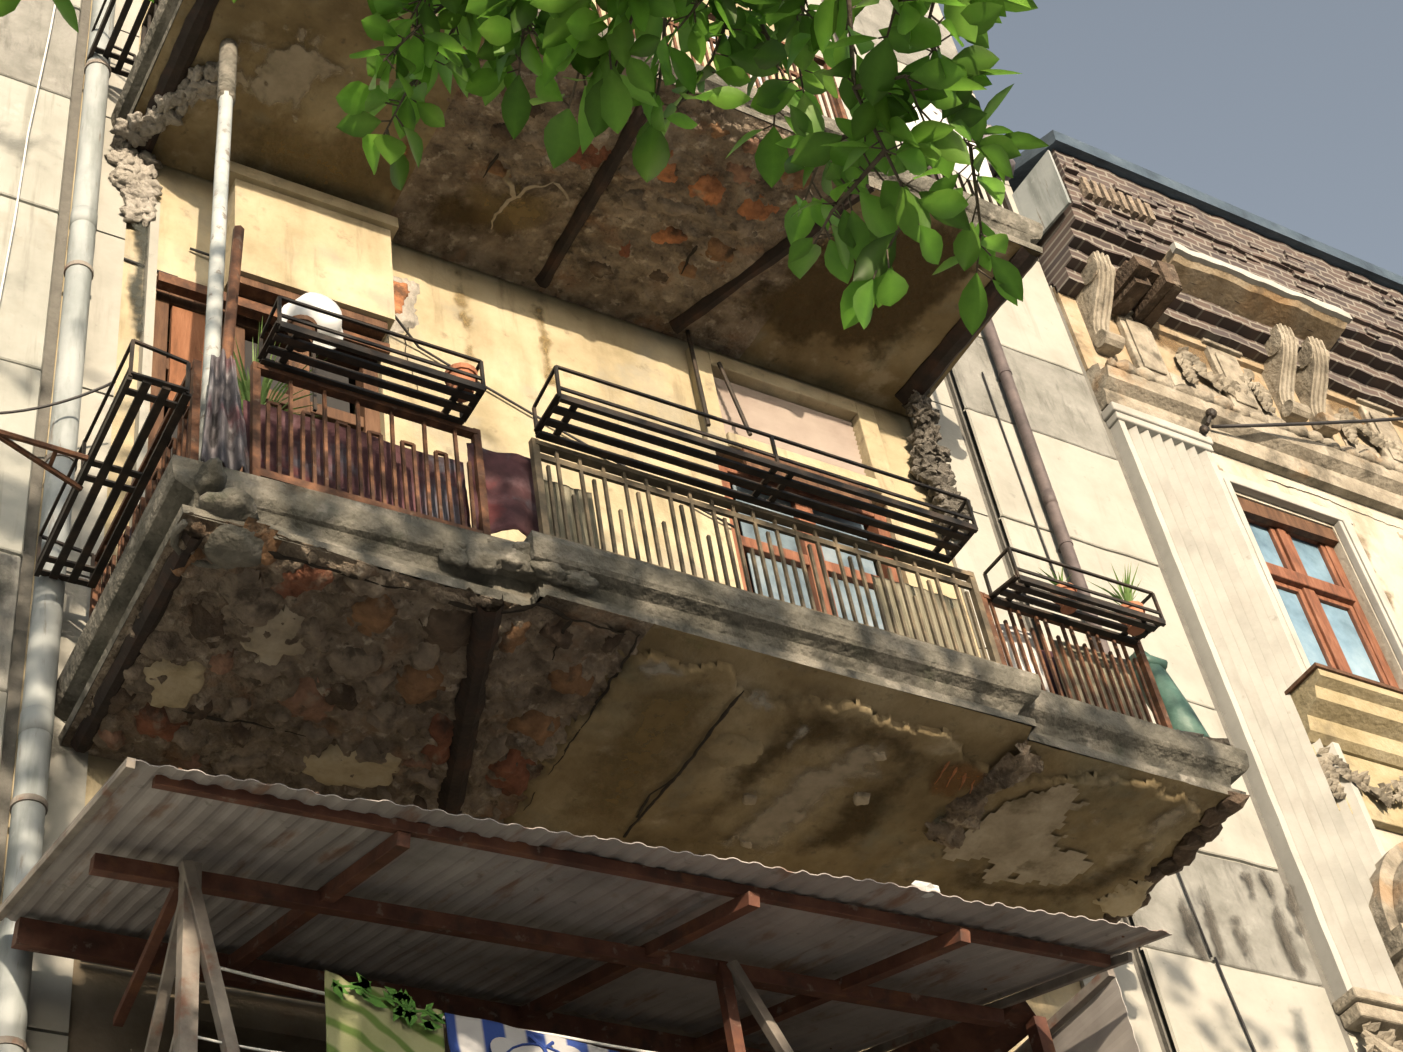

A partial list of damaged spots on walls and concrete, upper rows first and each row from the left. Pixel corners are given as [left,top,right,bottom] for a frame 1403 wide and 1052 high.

flaking render [236,28,353,121]
spalling [446,71,837,316]
flaking render [390,275,420,337]
spalling [81,512,643,824]
crack [623,691,744,838]
damp [738,717,916,788]
damp [810,779,903,848]
flaking render [942,783,1094,886]
spalling [1093,791,1250,923]